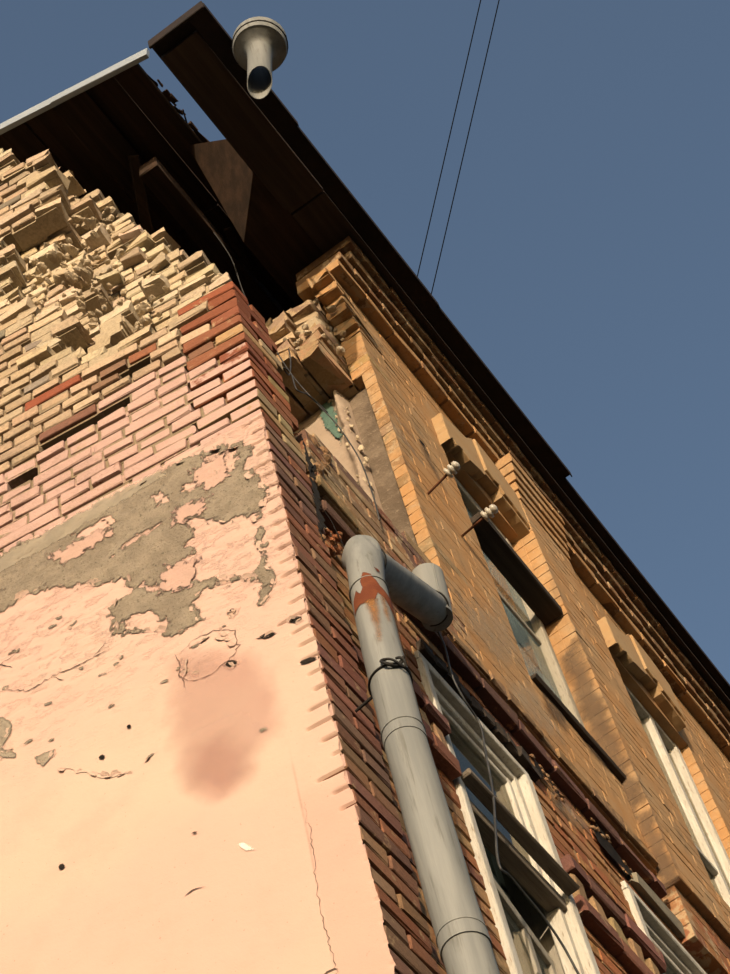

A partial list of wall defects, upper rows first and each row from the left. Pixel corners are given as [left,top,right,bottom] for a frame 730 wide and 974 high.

spalling [22,200,180,333]
spalling [283,305,346,356]
peeling [319,396,374,494]
peeling [0,439,280,638]
peeling [0,717,32,760]
peeling [34,738,132,779]
crack [305,804,338,974]